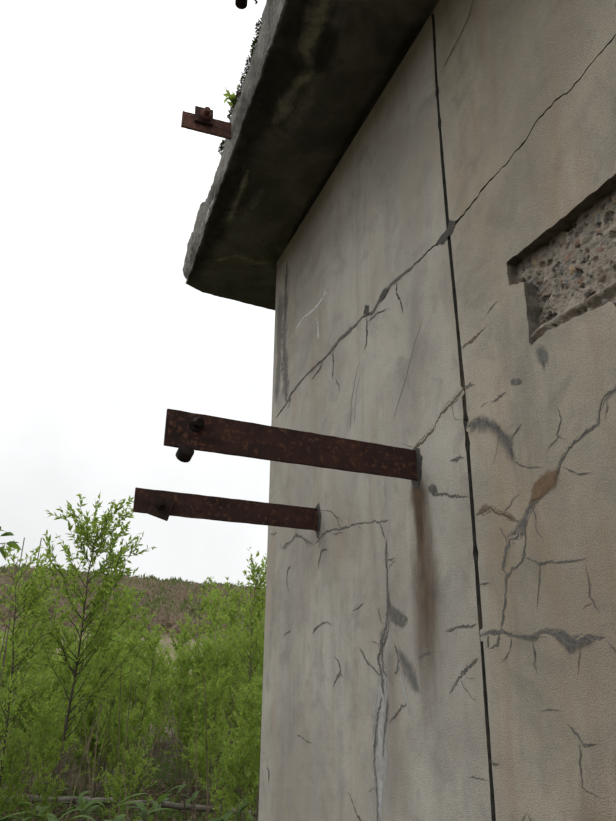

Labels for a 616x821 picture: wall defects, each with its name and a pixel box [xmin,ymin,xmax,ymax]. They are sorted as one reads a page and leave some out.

damp [188,0,343,279]
damp [289,22,425,241]
crack [276,34,616,418]
spalling [516,188,616,367]
crack [270,509,407,821]
crack [540,709,599,797]